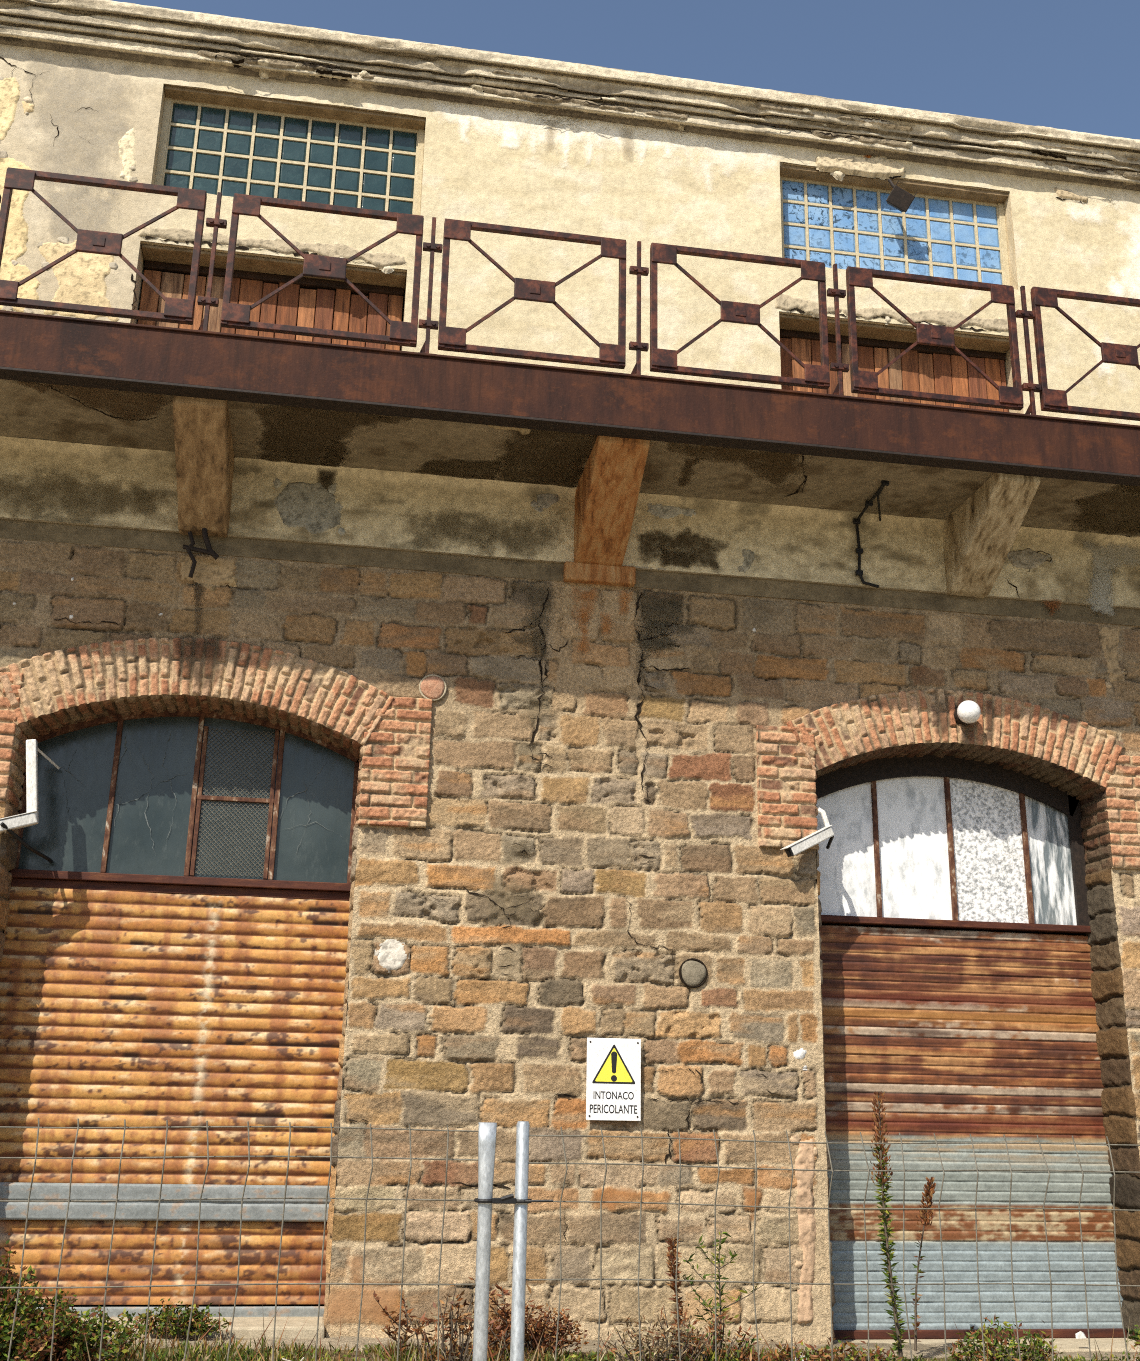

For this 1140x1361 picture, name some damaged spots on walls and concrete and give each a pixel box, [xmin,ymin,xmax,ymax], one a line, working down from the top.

crack [0,57,94,147]
flaking render [0,76,119,322]
spalling [197,50,376,90]
spalling [468,69,689,131]
spalling [755,101,913,181]
spalling [1028,145,1140,203]
water stain [0,477,151,515]
water stain [423,515,551,553]
water stain [640,530,725,569]
water stain [1077,485,1140,614]
crack [502,586,568,757]
crack [634,592,689,804]